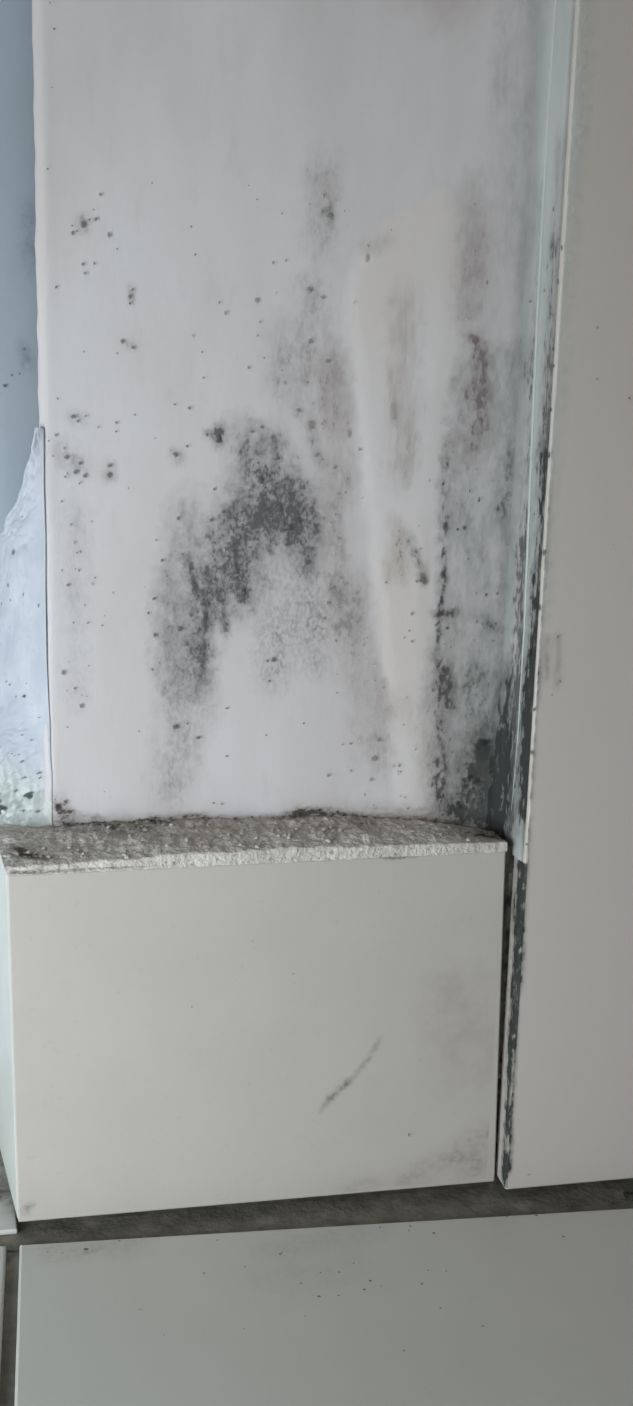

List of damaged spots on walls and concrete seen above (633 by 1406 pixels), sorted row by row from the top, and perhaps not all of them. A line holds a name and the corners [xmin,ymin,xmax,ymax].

damp [178,425,365,682]
damp [10,839,53,859]
damp [81,818,162,845]
damp [445,279,559,1186]